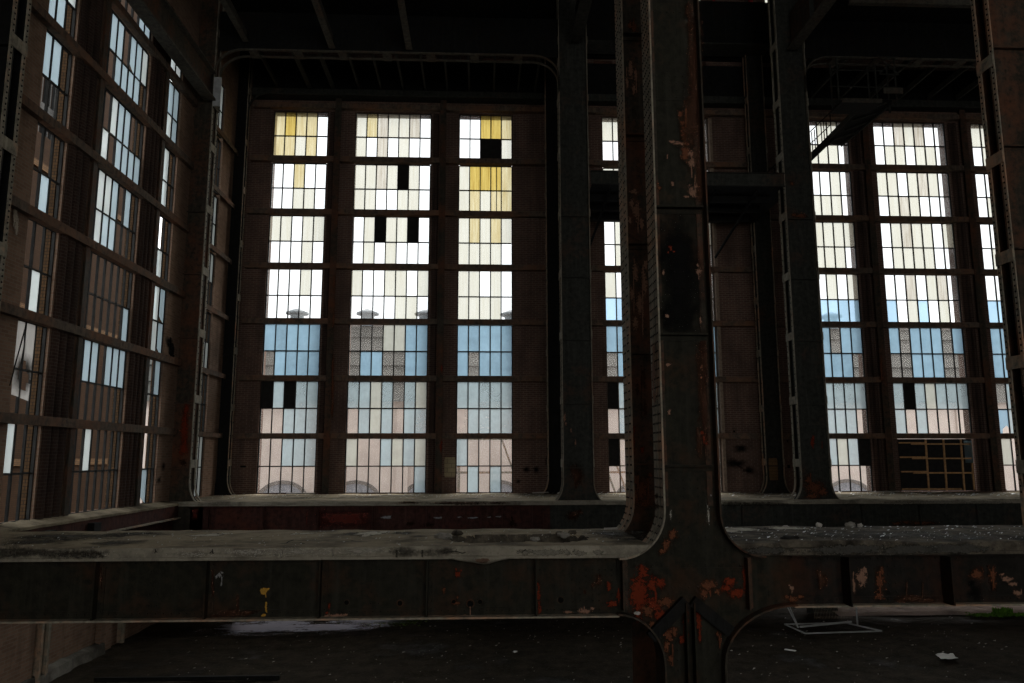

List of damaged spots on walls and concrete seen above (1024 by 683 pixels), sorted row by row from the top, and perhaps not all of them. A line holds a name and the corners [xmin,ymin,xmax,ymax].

peeling [667,140,698,198]
rust [564,565,676,627]
rust [852,566,935,603]
rust [969,564,1022,596]